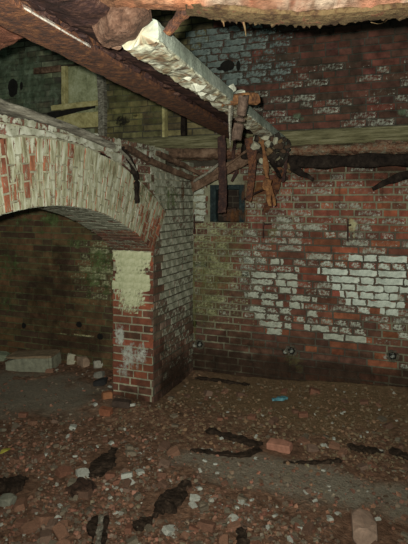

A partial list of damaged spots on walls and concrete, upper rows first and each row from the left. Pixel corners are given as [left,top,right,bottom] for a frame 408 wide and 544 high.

peeling [0,114,408,378]